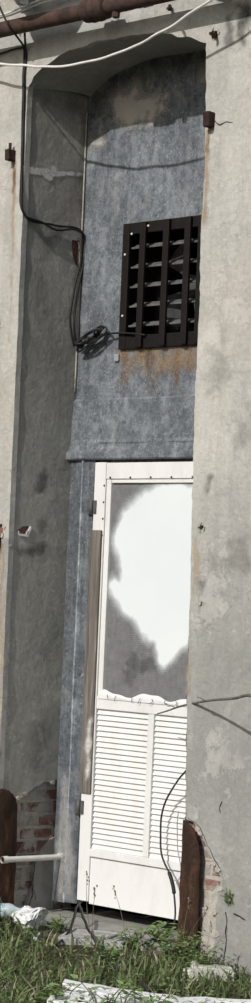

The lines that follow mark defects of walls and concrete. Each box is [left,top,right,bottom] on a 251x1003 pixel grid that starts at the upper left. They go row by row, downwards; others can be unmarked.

water stain [229,5,250,41]
spalling [14,780,71,910]
spalling [185,811,223,963]